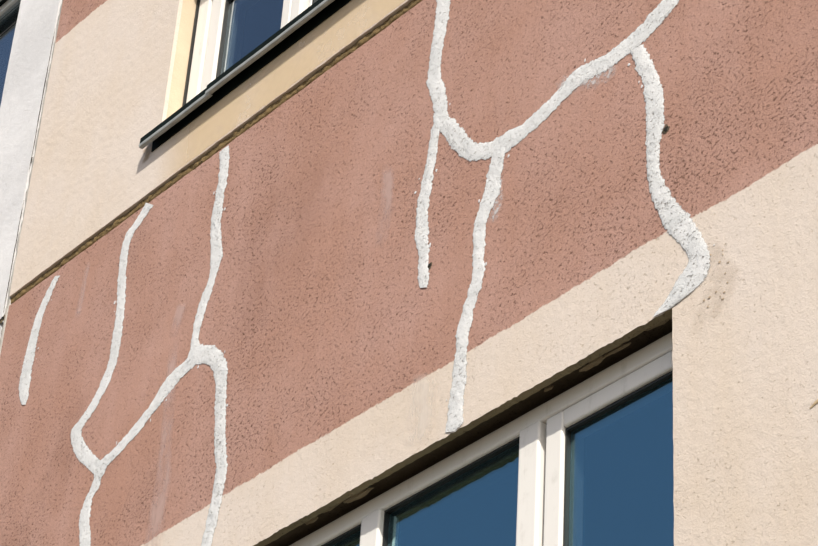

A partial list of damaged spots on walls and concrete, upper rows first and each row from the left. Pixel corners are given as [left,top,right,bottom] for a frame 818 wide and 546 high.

crack [19,276,60,405]
crack [29,32,55,169]
crack [70,145,230,546]
crack [414,0,715,432]